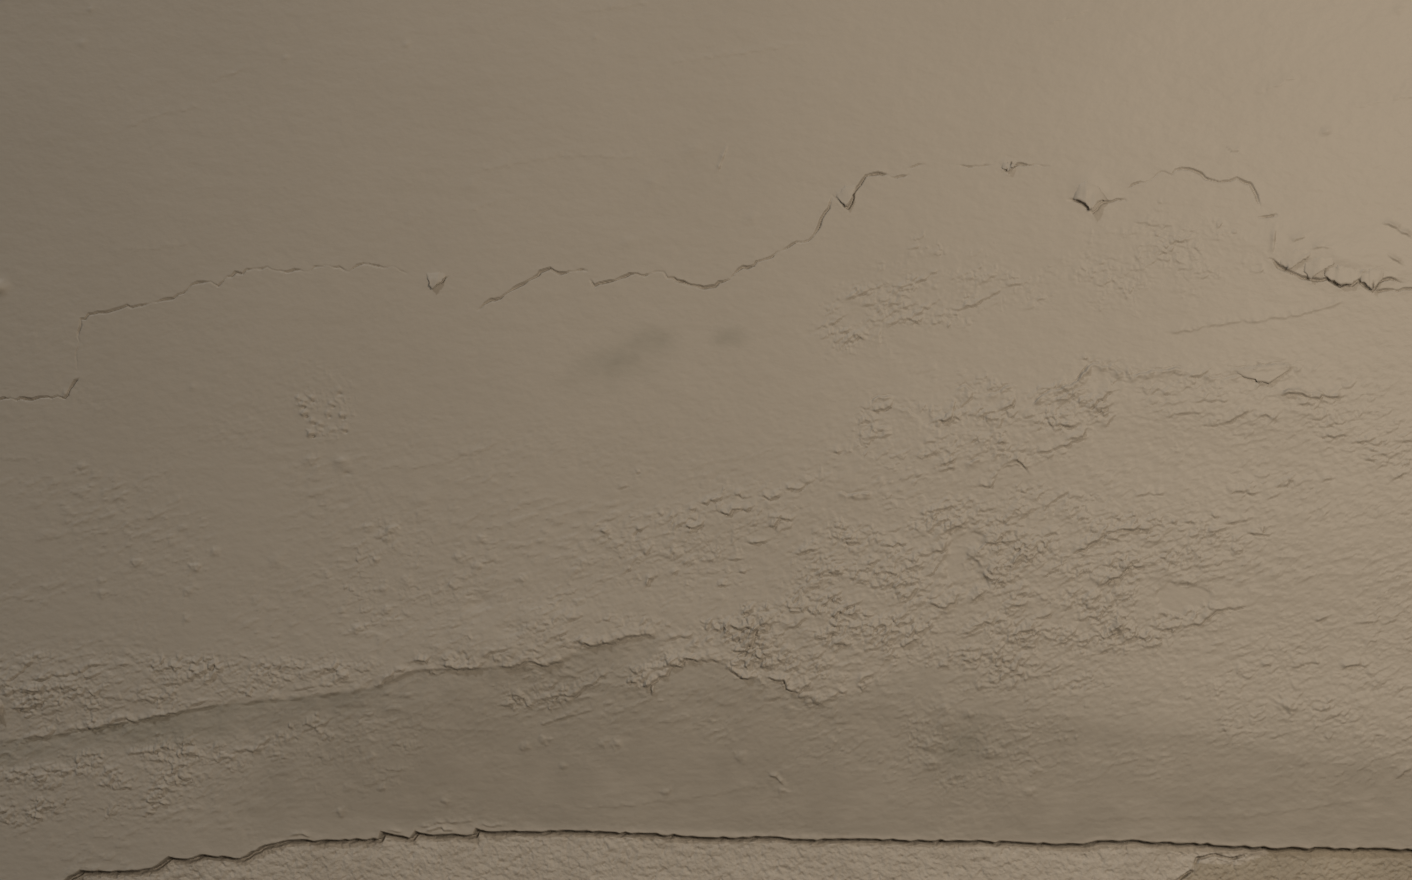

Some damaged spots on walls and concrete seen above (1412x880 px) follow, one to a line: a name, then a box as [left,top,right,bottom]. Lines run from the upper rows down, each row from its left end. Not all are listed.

crack [0,260,412,405]
crack [473,159,1055,317]
crack [1102,164,1282,255]
peeling [1161,217,1412,340]
peeling [371,582,900,713]
spalling [57,816,1412,880]